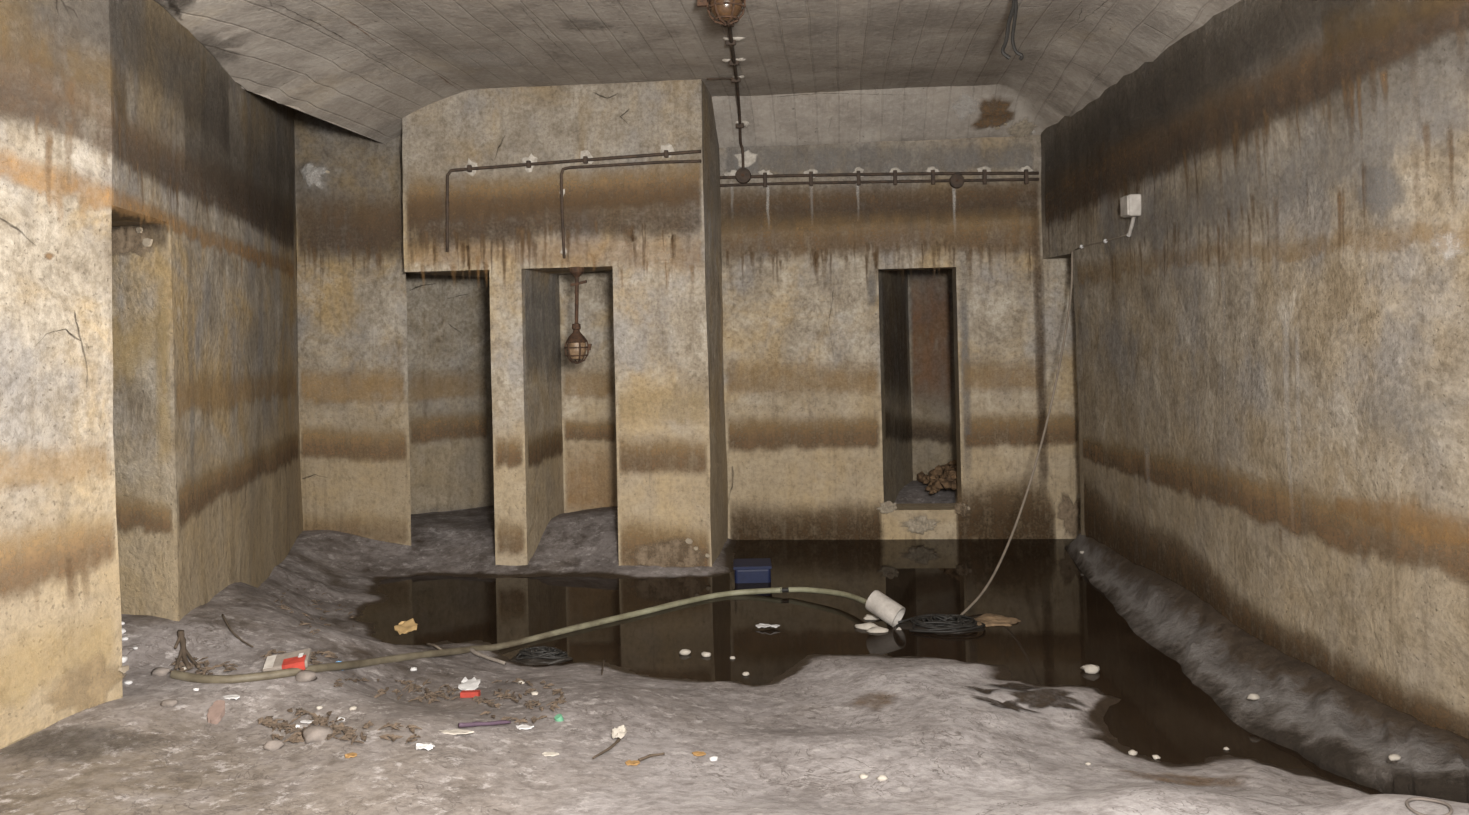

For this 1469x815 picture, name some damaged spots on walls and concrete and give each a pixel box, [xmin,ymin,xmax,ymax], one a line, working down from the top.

crack [47,310,88,374]
water stain [0,0,1469,595]
water stain [1084,483,1469,740]